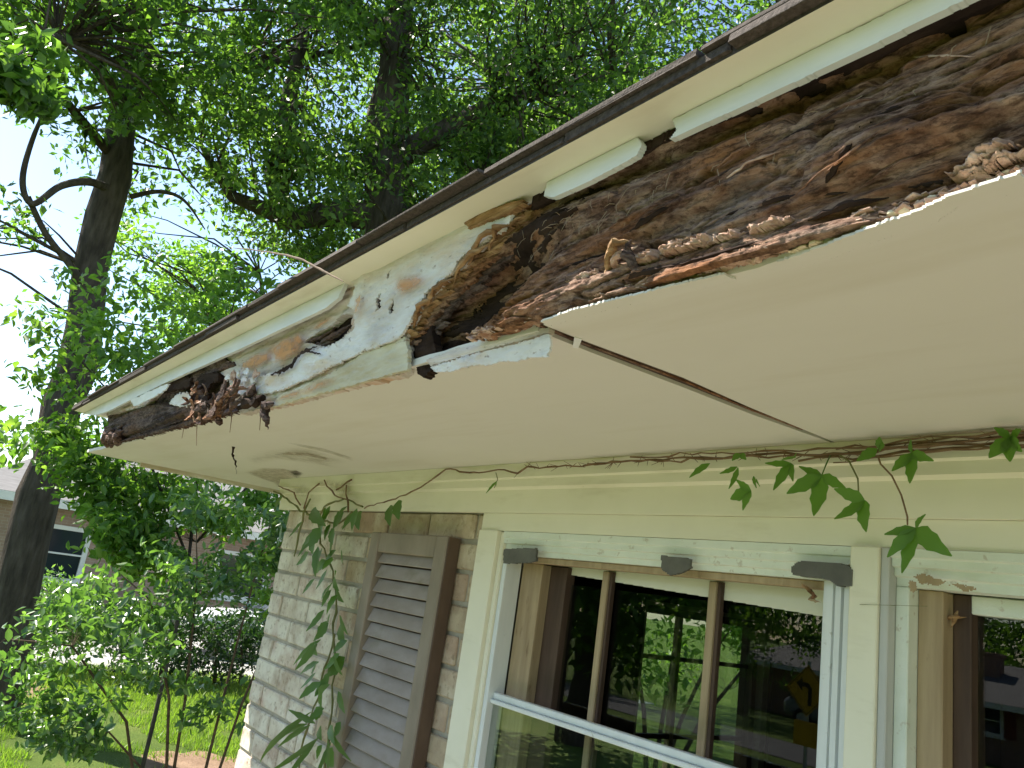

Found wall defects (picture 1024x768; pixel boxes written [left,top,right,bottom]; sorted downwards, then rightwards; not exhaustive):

peeling [777,169,1024,269]
peeling [167,199,536,425]
peeling [426,272,736,373]
crack [536,323,803,430]
peeling [908,573,976,593]